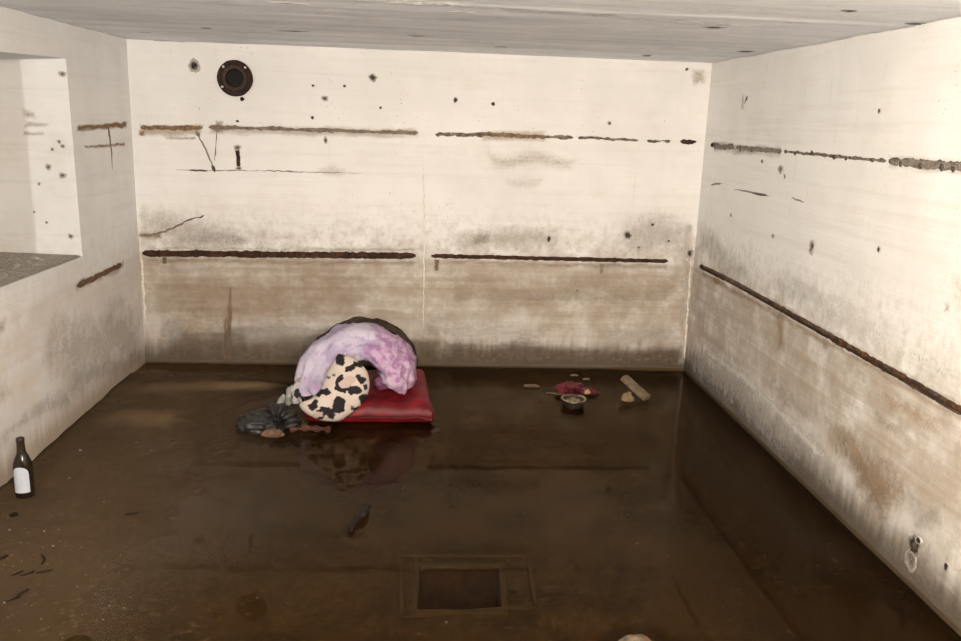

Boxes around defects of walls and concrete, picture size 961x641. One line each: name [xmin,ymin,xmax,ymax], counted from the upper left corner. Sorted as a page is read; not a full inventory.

water stain [171,330,321,361]
water stain [449,327,681,365]
water stain [837,429,902,507]